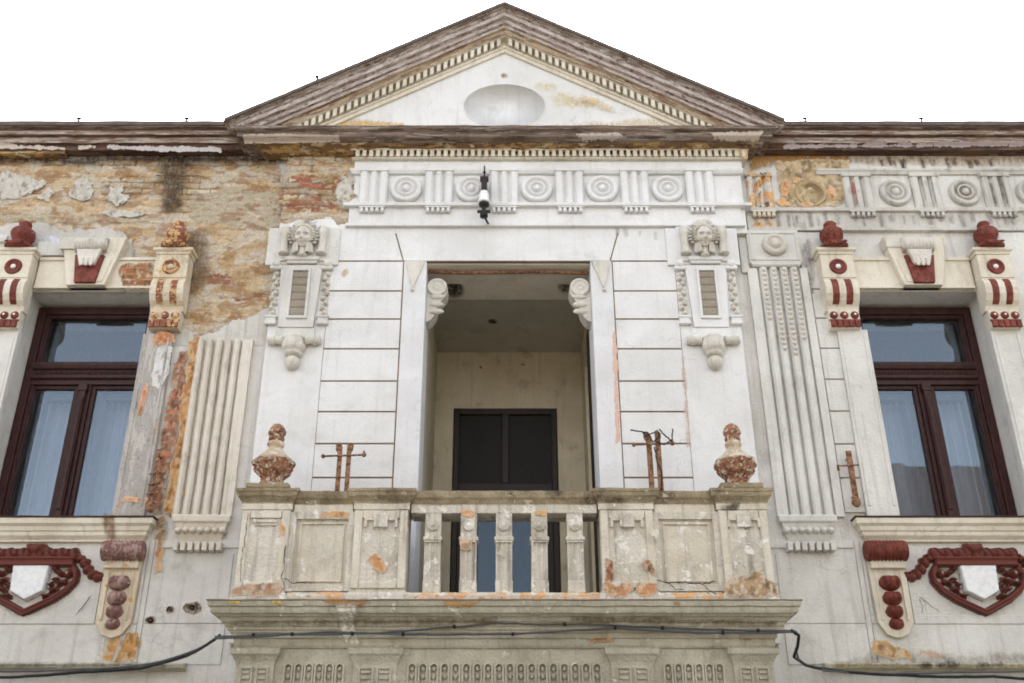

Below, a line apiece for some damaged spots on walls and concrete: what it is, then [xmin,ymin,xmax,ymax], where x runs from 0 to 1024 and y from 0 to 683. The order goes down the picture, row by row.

leakage [0,155,286,210]
spalling [709,130,1024,227]
spalling [0,142,357,573]
peeling [612,331,621,443]
spalling [367,553,387,573]
spalling [524,558,657,599]
spalling [723,571,780,599]
spalling [145,602,202,625]
peeling [413,593,511,618]
spalling [102,632,141,663]
spalling [870,639,912,660]